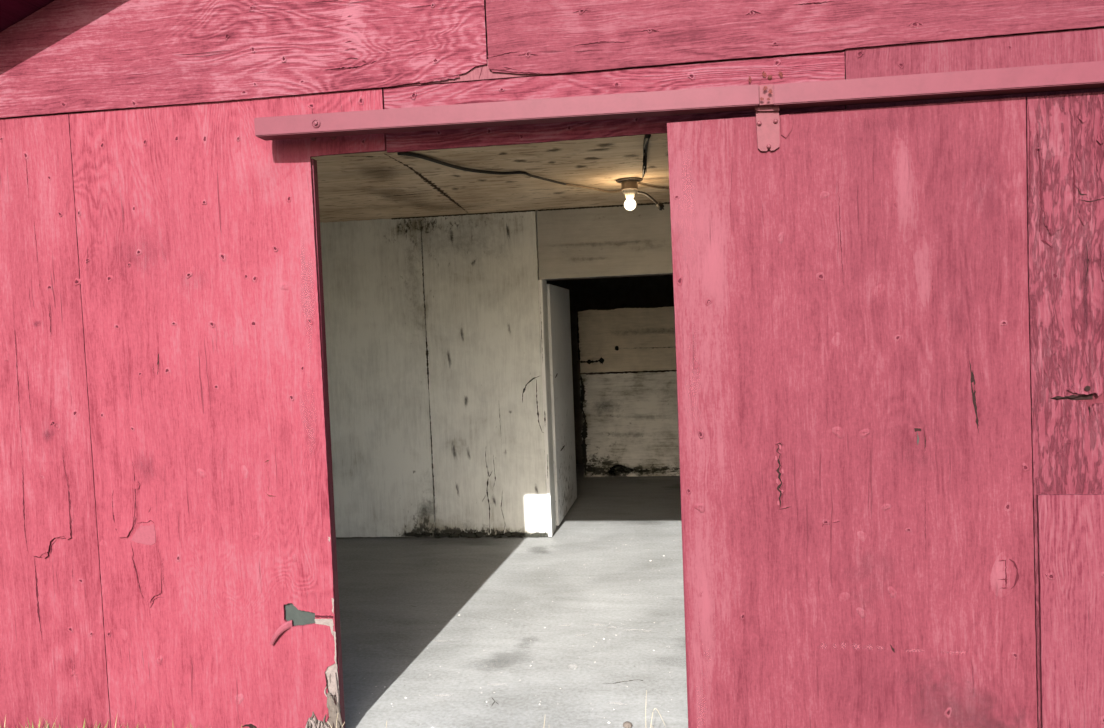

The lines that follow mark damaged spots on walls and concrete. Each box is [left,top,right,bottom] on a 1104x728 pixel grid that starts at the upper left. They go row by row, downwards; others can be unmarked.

crack [349,154,468,213]
crack [34,224,53,340]
crack [13,306,75,641]
damp [585,464,651,476]
crack [112,460,166,608]
spalling [305,631,344,728]